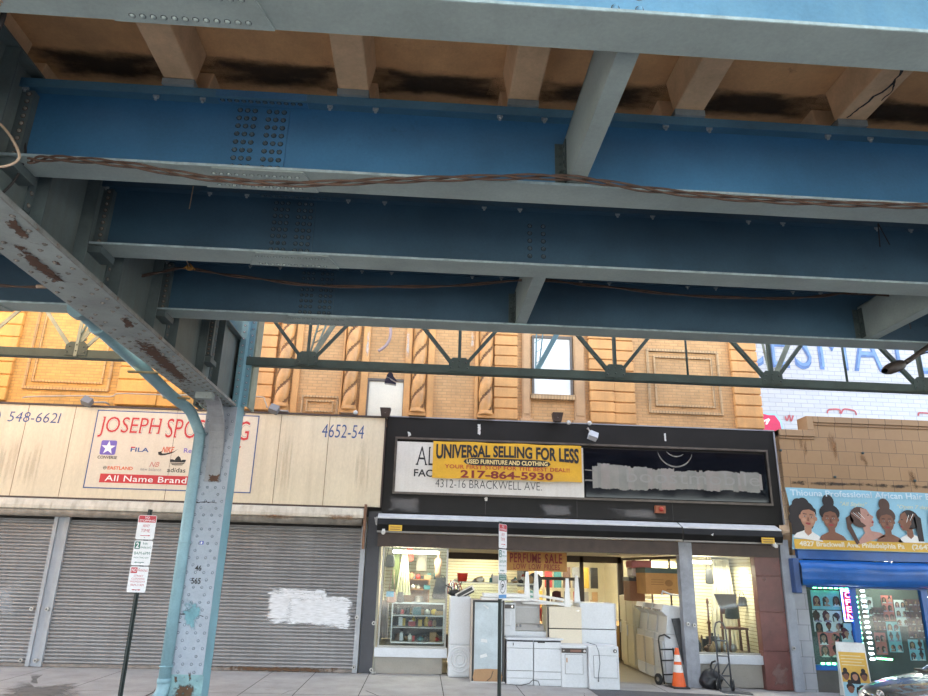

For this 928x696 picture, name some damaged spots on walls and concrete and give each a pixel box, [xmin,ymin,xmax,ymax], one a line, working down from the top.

crack [846,70,904,118]
rust [14,245,64,282]
rust [136,339,191,385]
rust [174,673,194,696]